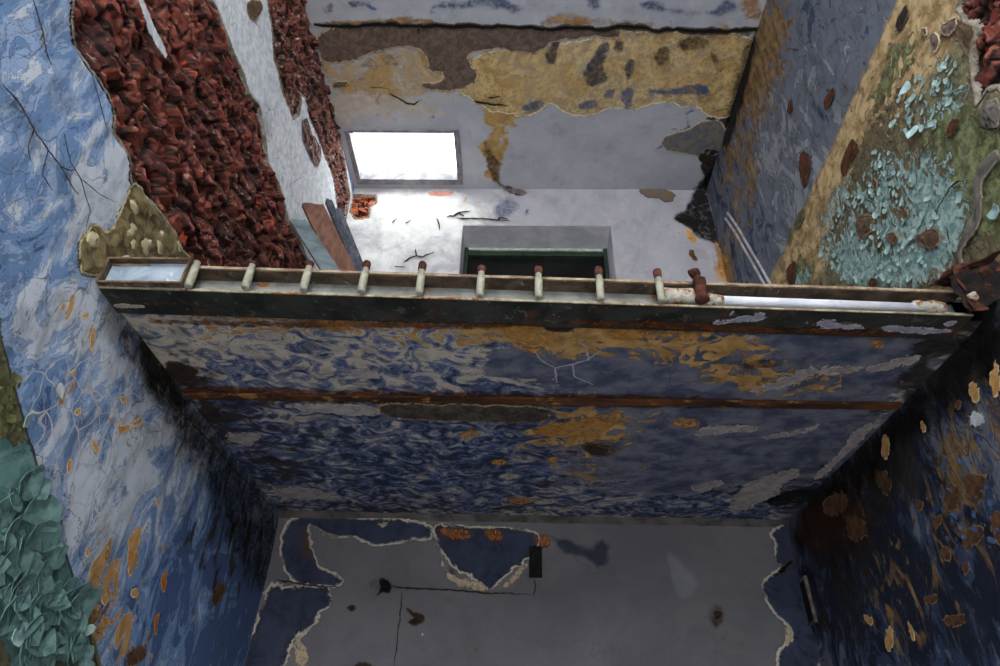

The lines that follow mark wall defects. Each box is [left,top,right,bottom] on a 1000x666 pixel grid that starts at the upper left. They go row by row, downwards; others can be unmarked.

crack [314,20,759,35]
crack [3,85,114,227]
flaking render [69,0,307,278]
spalling [247,0,628,221]
crack [394,211,510,267]
peeling [816,148,962,287]
water stain [117,319,540,666]
rust [182,386,746,408]
crack [535,342,601,385]
peeling [728,468,802,514]
peeling [932,359,1000,563]
crack [392,578,536,663]